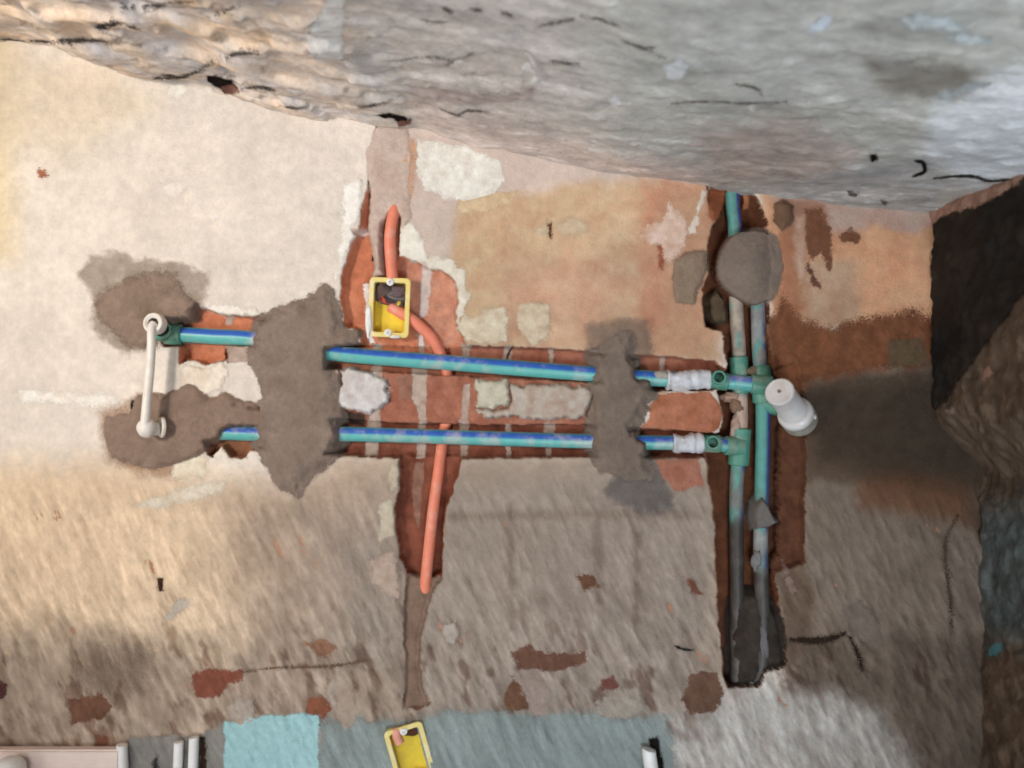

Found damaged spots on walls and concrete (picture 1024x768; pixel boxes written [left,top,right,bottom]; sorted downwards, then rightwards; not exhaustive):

crack [440,108,489,118]
spalling [334,178,588,366]
spalling [634,187,753,376]
spalling [739,194,768,230]
spalling [803,206,861,289]
crack [911,160,1011,184]
spalling [332,361,594,434]
spalling [639,386,734,437]
spalling [340,441,588,600]
spalling [649,392,808,715]
crack [789,629,866,672]
peeling [127,643,681,768]